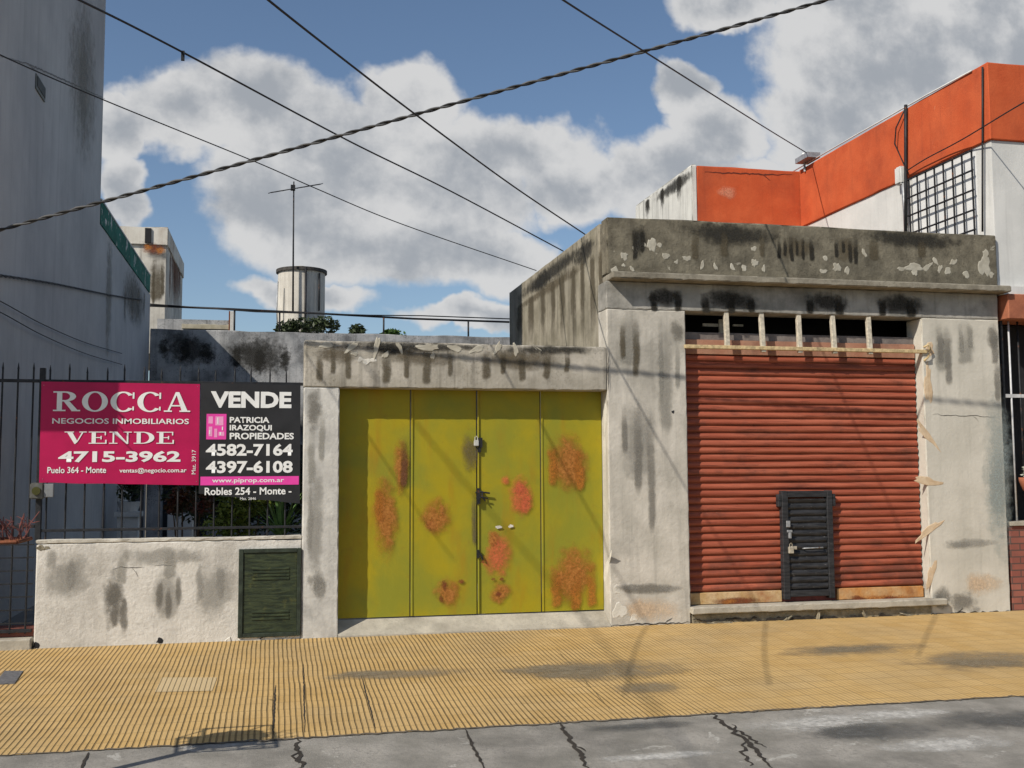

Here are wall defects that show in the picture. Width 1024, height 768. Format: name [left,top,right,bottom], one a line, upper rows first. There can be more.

leakage [517,241,602,329]
peeling [611,238,765,272]
leakage [835,232,951,264]
peeling [897,249,994,279]
flaking render [344,337,403,365]
leakage [316,341,472,383]
flaking render [415,341,519,359]
leakage [483,346,584,380]
rust [548,438,585,489]
rust [375,448,408,546]
rust [551,550,596,609]
crack [713,714,773,768]